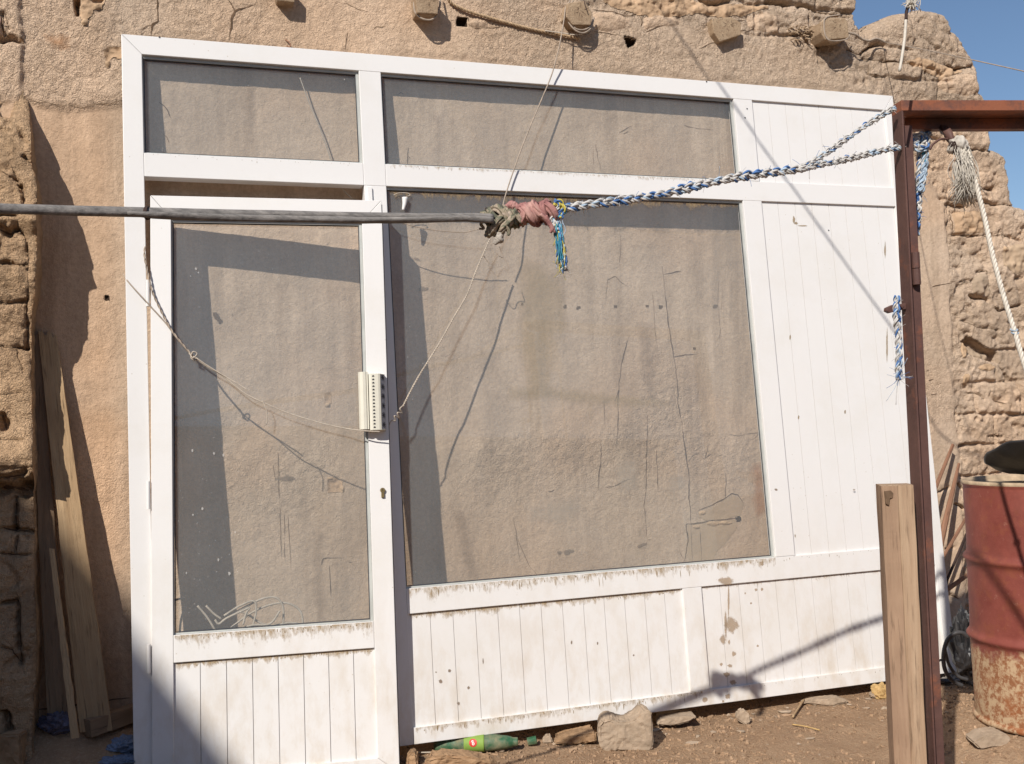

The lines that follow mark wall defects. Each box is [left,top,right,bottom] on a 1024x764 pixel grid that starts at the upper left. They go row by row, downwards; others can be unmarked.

spalling [907,57,962,81]
spalling [961,343,995,388]